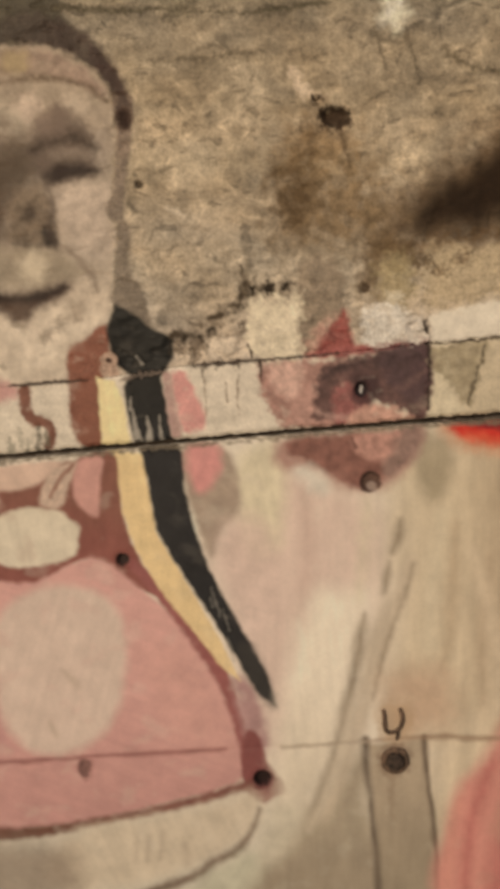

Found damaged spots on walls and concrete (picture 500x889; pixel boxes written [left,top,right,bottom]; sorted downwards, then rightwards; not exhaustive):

leakage [165,96,500,368]
crack [6,376,89,390]
crack [194,341,341,419]